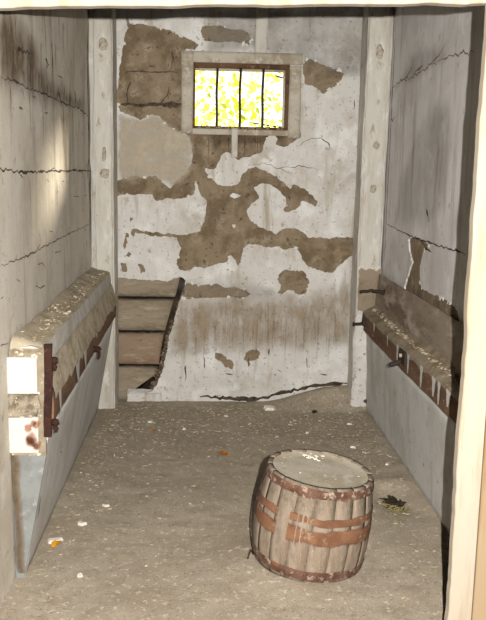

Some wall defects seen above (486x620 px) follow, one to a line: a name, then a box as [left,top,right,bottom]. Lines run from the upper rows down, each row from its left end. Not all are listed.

crack [0,32,90,196]
crack [385,43,474,255]
crack [2,220,90,266]
flaking render [117,18,353,390]
flaking render [406,237,459,321]
leakage [177,299,346,345]
crack [200,381,347,402]
corrosion [25,421,40,449]